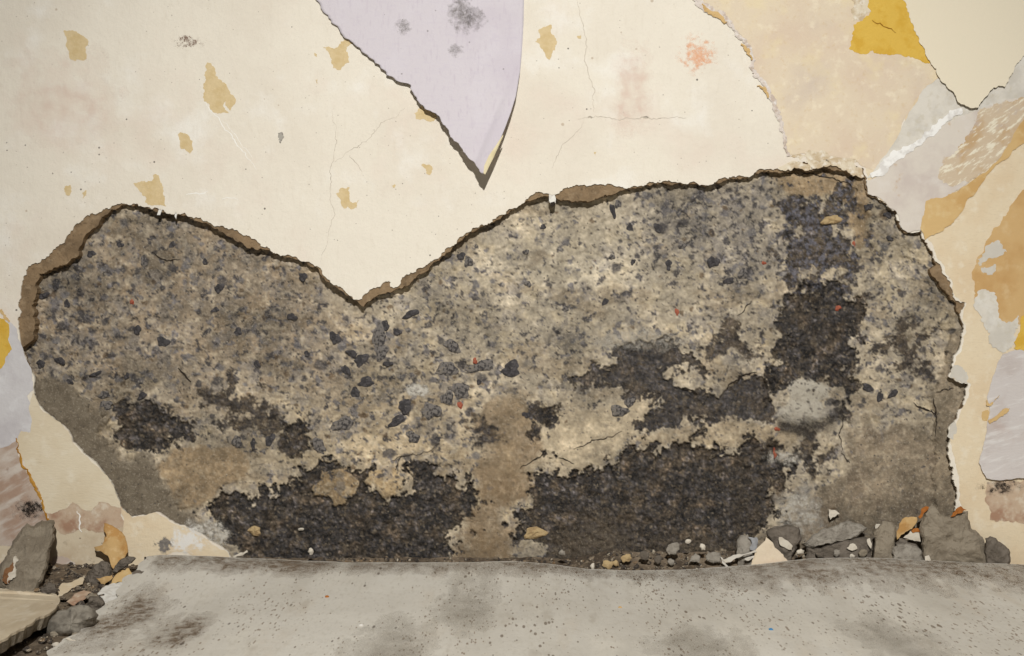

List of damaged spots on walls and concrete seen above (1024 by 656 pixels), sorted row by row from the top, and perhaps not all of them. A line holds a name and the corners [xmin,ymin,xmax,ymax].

peeling [314,39,352,70]
peeling [415,106,437,122]
flaking render [0,150,967,606]
efflorescence [761,450,807,467]
leakage [450,399,545,558]